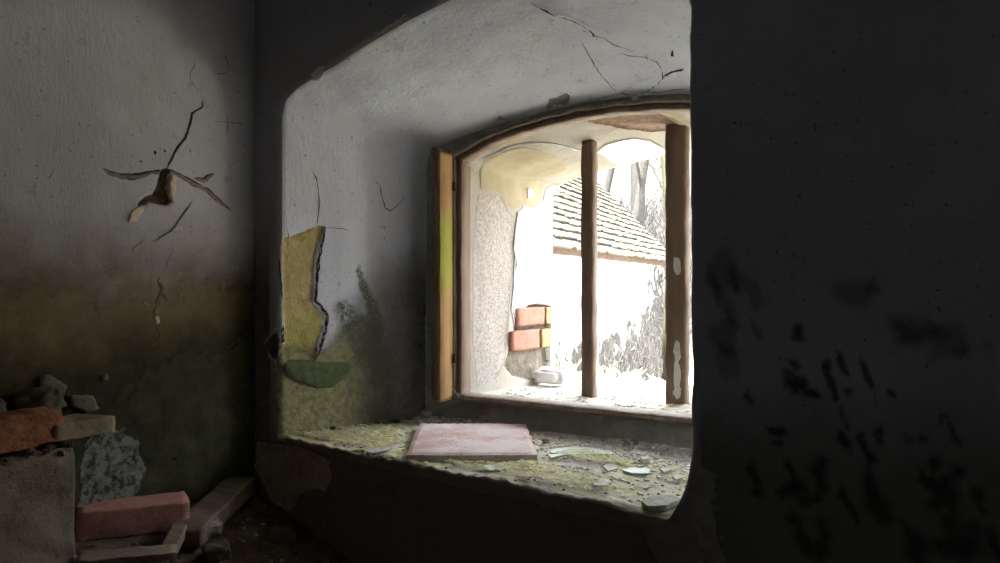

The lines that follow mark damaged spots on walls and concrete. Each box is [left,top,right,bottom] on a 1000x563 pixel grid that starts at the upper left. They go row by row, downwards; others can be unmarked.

flaking render [128,169,177,223]
crack [167,62,241,170]
flaking render [265,226,355,388]
flaking render [473,148,566,385]
crack [531,3,685,104]
damp [0,255,659,563]